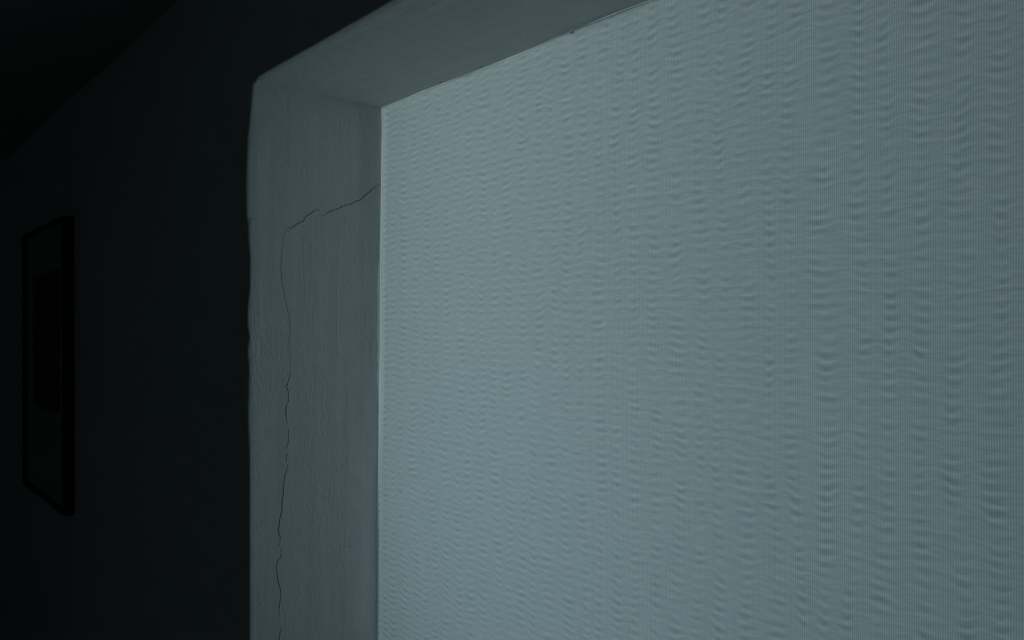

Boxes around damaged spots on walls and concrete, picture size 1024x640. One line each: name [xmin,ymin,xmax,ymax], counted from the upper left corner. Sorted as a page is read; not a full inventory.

crack [276,184,381,640]